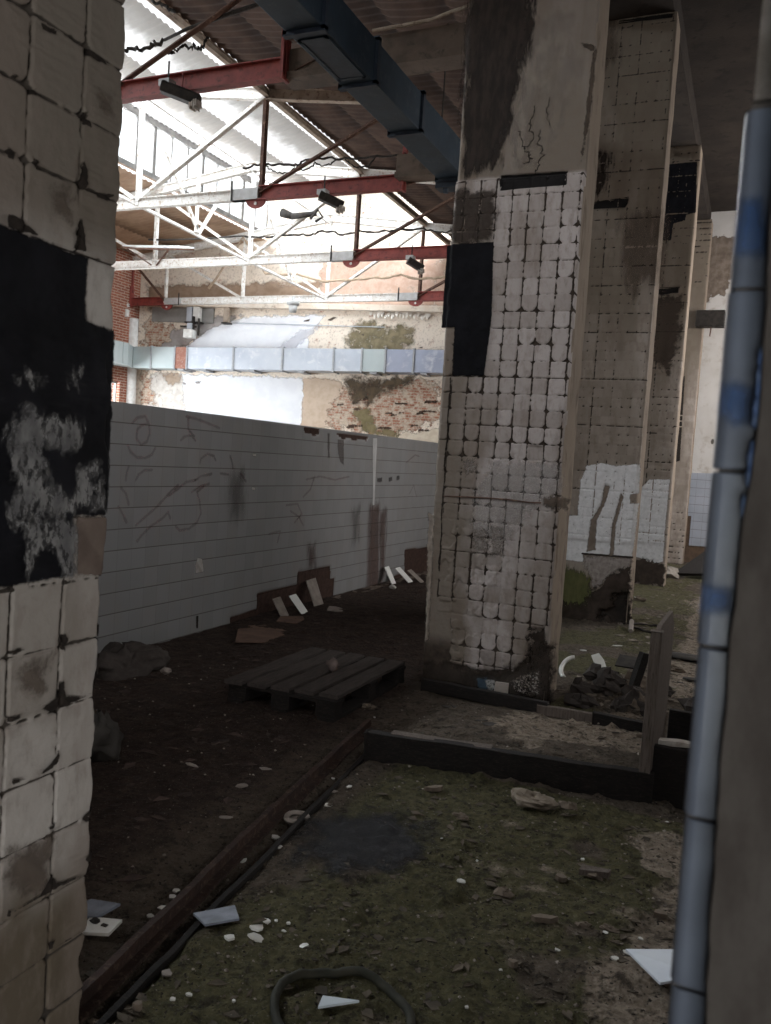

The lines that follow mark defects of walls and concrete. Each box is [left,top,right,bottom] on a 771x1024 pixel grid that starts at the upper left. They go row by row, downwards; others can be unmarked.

water stain [450,0,537,244]
crack [518,97,551,175]
water stain [344,320,415,349]
flaking render [301,377,442,440]
peeling [5,404,106,578]
water stain [562,558,666,625]